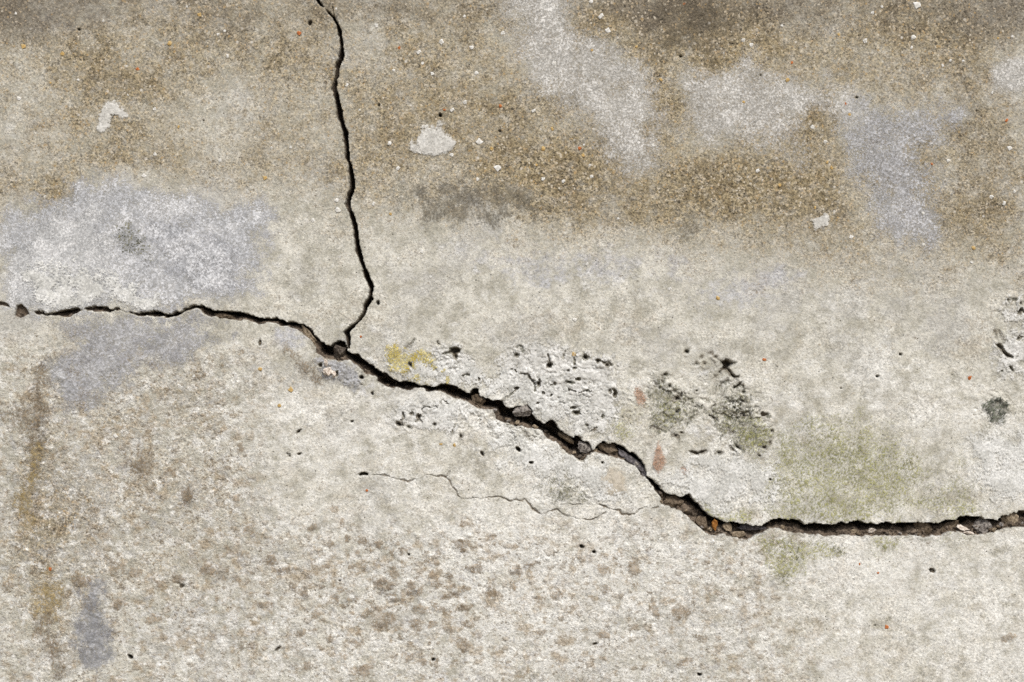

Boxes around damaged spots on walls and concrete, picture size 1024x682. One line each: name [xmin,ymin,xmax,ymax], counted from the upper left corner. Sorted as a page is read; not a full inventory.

crack [0,0,1024,541]